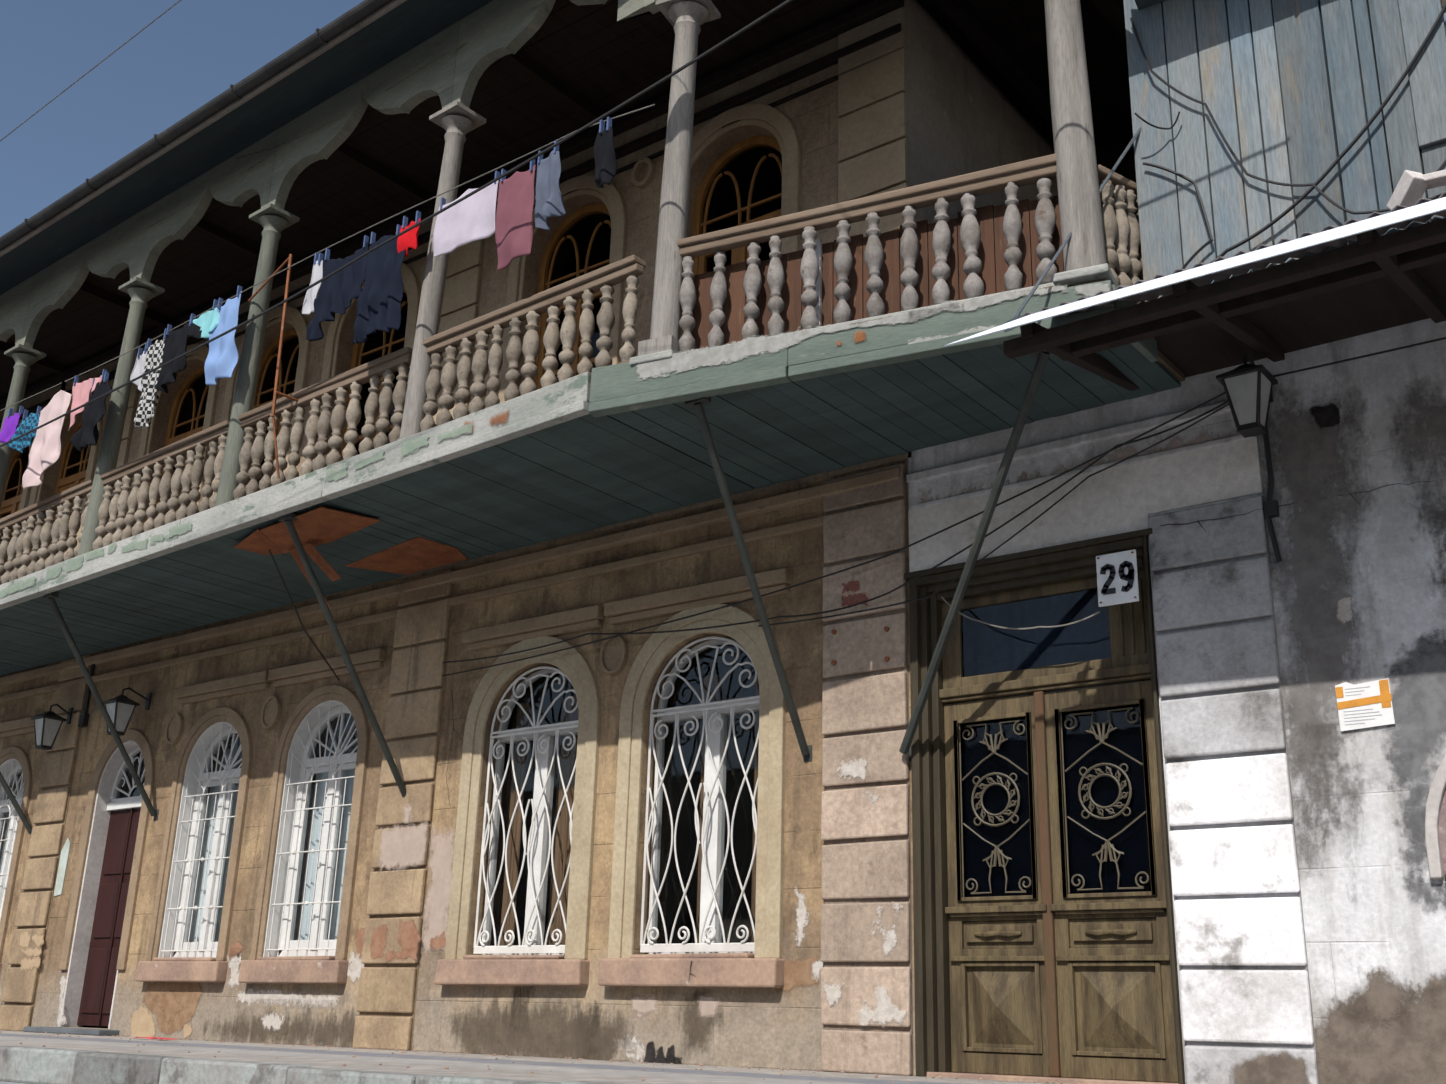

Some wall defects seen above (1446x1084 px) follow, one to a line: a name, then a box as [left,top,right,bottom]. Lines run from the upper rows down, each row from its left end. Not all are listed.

peeling [635,283,1115,380]
water stain [1395,387,1446,533]
peeling [837,759,878,804]
water stain [1387,638,1446,907]
peeling [793,887,810,946]
peeling [872,903,903,956]
water stain [454,989,623,1061]
water stain [643,994,712,1064]
peeling [812,961,842,1006]
peeling [858,985,906,1025]
water stain [1233,968,1446,1084]